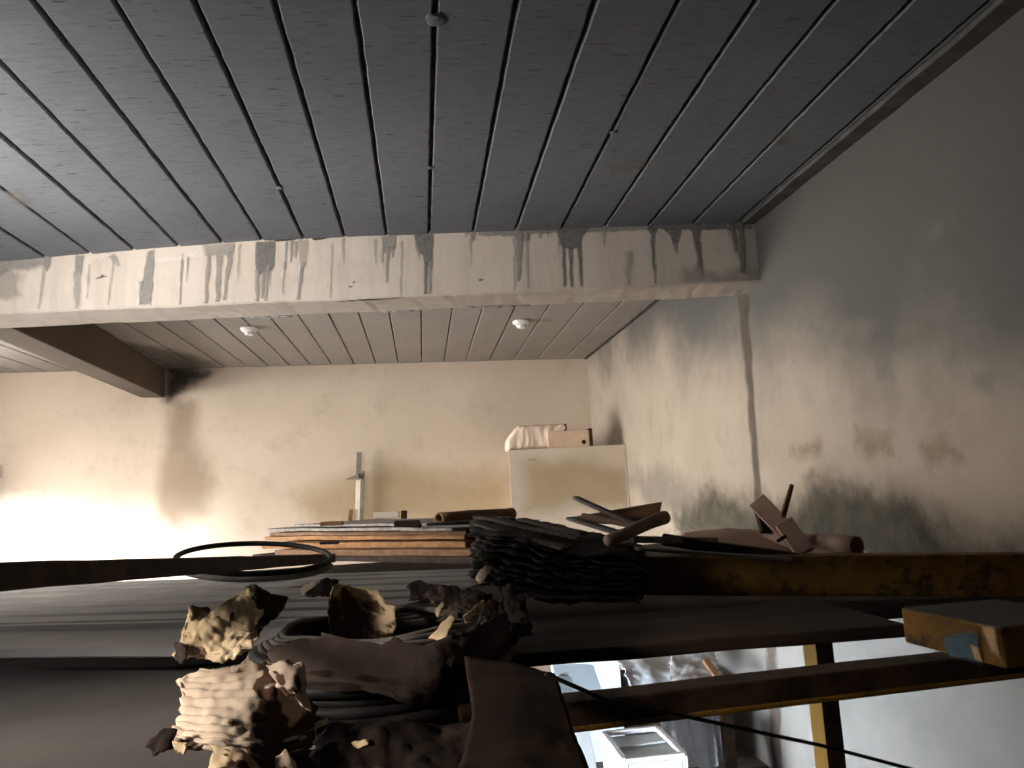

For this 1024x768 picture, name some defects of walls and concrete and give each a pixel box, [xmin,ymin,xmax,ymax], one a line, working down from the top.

leakage [0,255,51,308]
leakage [74,256,89,308]
leakage [139,251,154,304]
leakage [179,254,189,305]
leakage [204,243,240,303]
leakage [255,240,307,301]
leakage [374,235,403,293]
leakage [414,234,433,294]
leakage [513,228,588,287]
leakage [648,222,745,285]
leakage [676,490,759,534]
leakage [786,486,989,553]